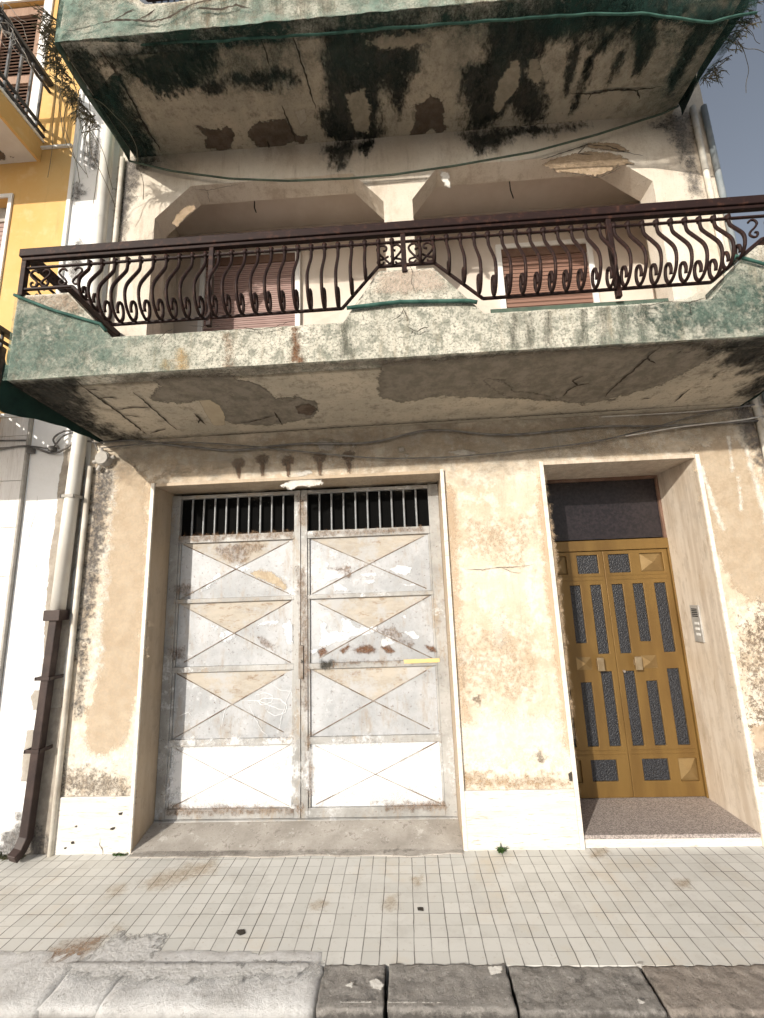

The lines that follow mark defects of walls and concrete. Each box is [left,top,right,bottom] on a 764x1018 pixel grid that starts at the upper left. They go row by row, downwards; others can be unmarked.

water stain [64,40,301,240]
water stain [317,16,422,171]
spalling [410,94,447,135]
flaking render [542,142,635,177]
spalling [149,375,319,426]
crack [76,346,744,440]
spalling [376,344,724,406]
water stain [679,338,764,512]
water stain [72,466,116,717]
corrosion [298,569,334,682]
corrosion [341,628,401,664]
water stain [61,735,132,796]